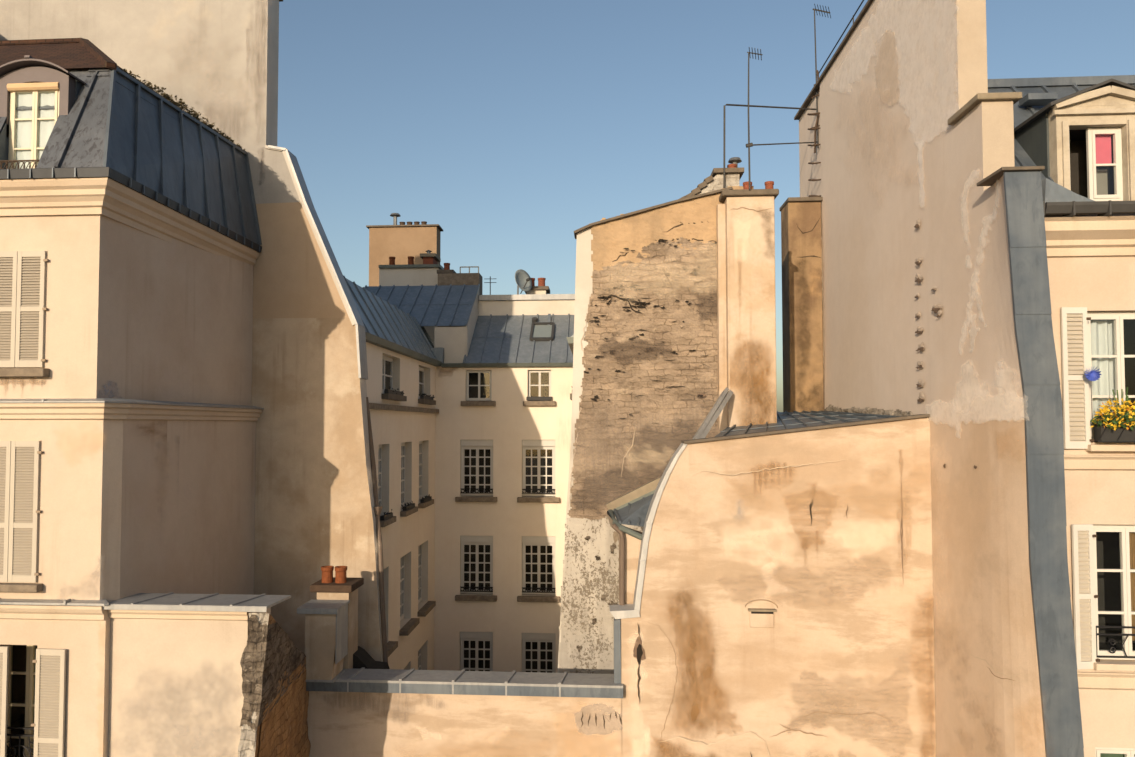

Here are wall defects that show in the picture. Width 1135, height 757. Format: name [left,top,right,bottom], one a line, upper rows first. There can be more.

damp [735,346,776,426]
spalling [559,237,718,674]
crack [897,473,905,569]
spalling [259,657,311,757]
flaking render [575,704,622,735]
damp [657,741,690,757]
damp [670,596,734,728]